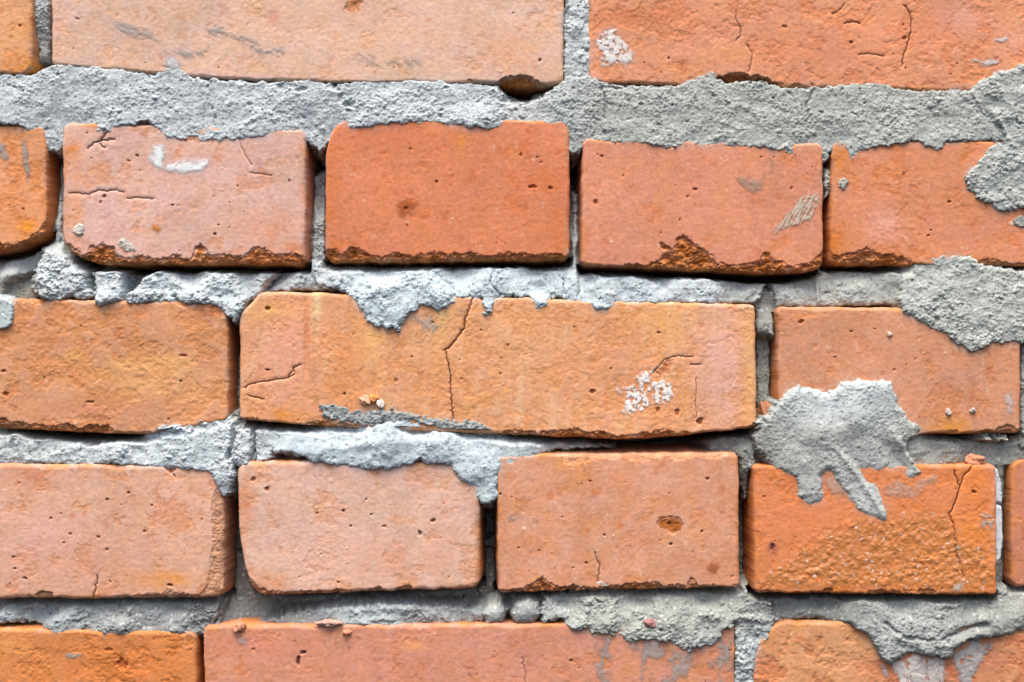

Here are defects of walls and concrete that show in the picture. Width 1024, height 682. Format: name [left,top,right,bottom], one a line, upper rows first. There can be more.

water stain [597,29,632,66]
crack [860,8,911,65]
spalling [495,75,548,95]
spalling [66,242,311,270]
spalling [325,247,568,266]
spalling [610,235,914,277]
crack [446,298,473,417]
water stain [616,367,677,414]
crack [653,355,701,417]
crack [949,466,972,575]